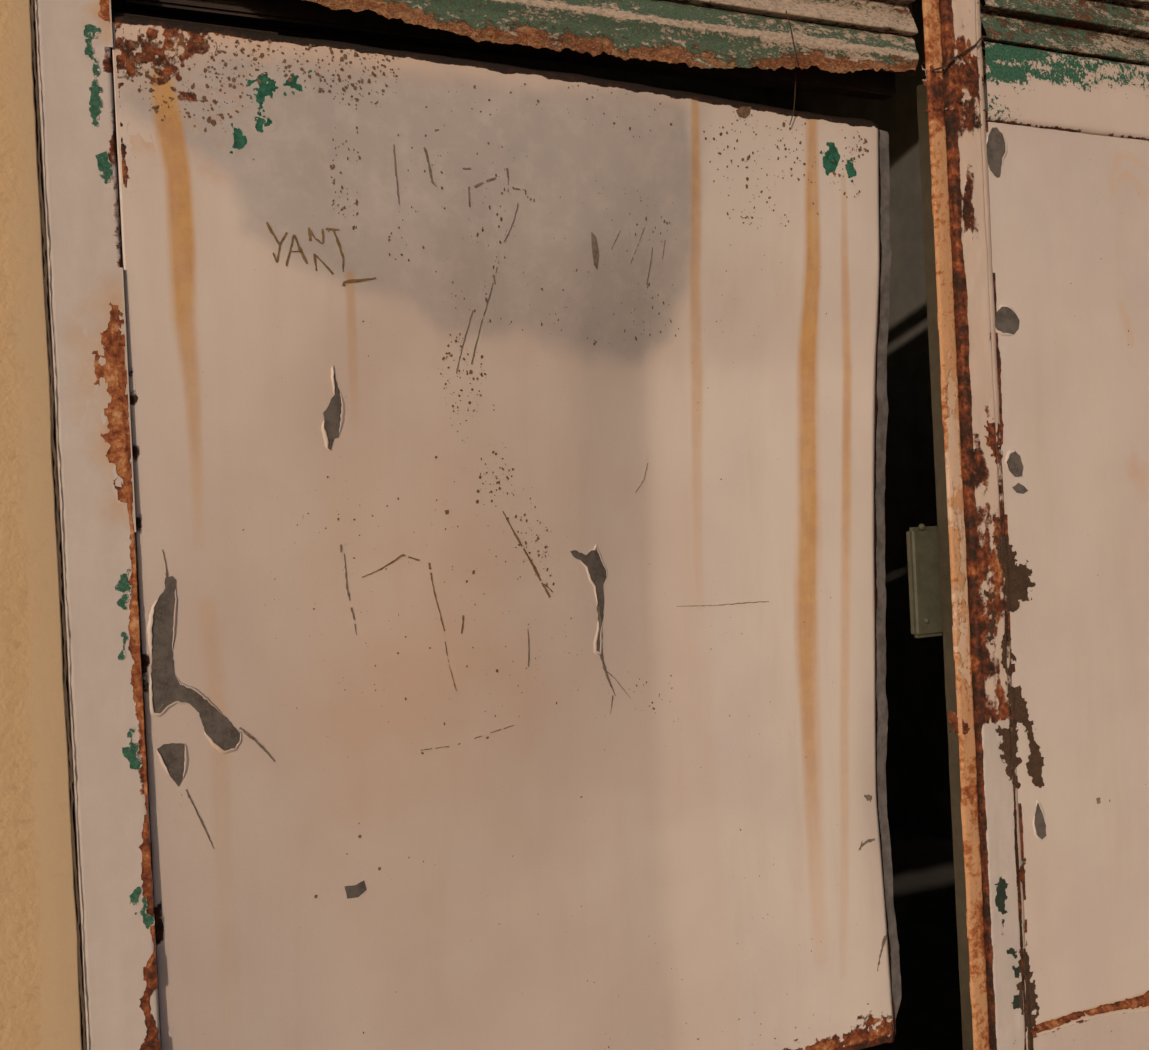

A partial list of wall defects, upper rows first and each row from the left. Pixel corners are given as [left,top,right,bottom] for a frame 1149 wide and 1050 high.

peeling [986,127,1008,178]
rust [74,0,399,553]
peeling [995,304,1020,336]
peeling [321,365,345,451]
rust [613,93,869,982]
peeling [1004,449,1028,494]
rust [59,267,161,1050]
peeling [147,549,275,762]
peeling [570,543,630,714]
rust [984,533,1045,789]
rust [754,1002,896,1050]
rust [1015,941,1149,1050]